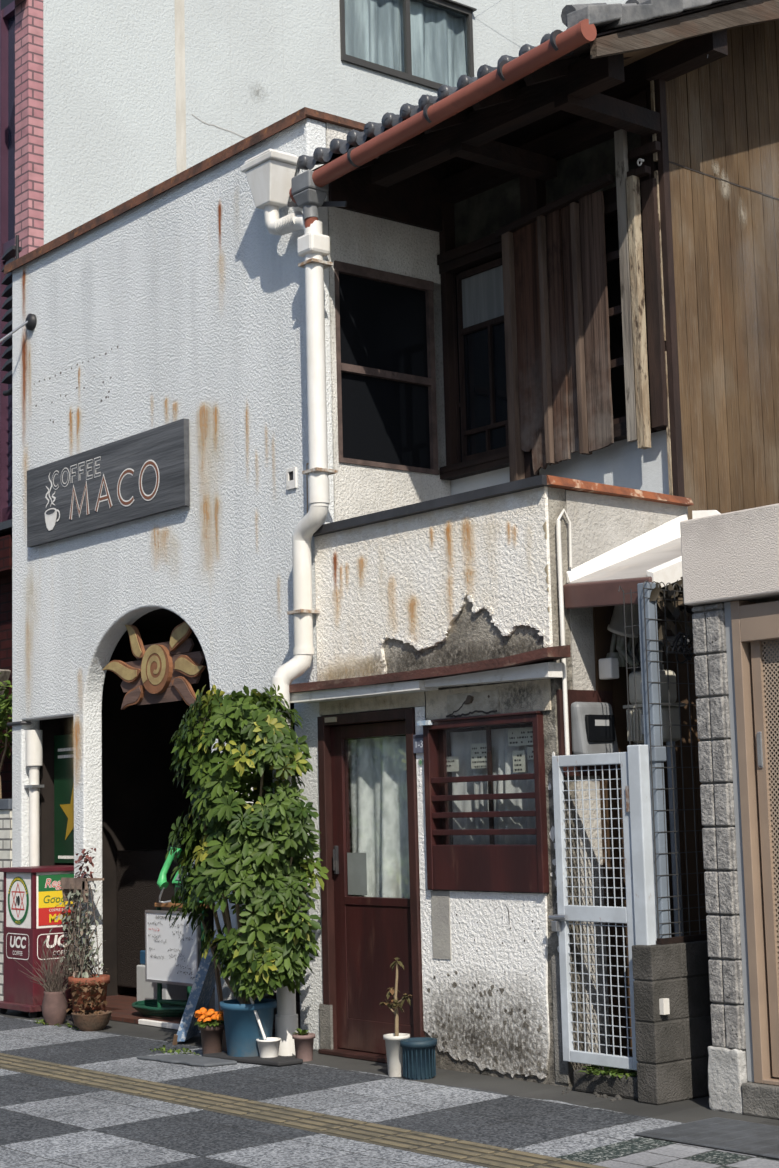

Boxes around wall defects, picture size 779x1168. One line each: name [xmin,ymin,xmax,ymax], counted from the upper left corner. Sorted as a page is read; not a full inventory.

corrosion [22,335,30,405]
corrosion [200,405,217,445]
corrosion [203,499,218,537]
corrosion [430,522,471,555]
corrosion [333,553,363,595]
flaking render [379,591,548,674]